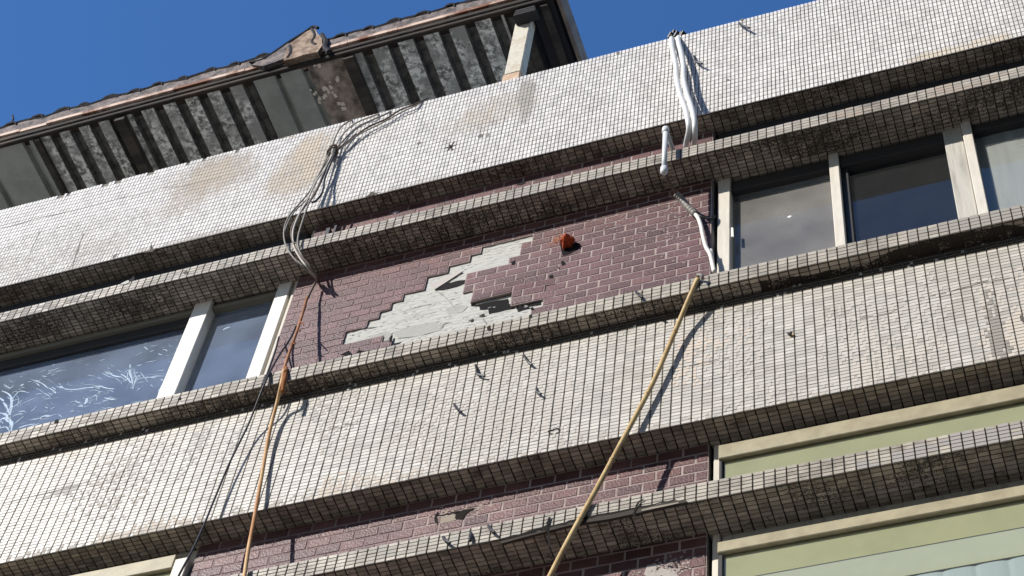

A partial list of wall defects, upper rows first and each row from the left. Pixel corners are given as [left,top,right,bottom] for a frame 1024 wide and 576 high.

damp [697,38,1024,130]
damp [0,150,336,303]
damp [369,148,572,212]
spalling [341,236,543,356]